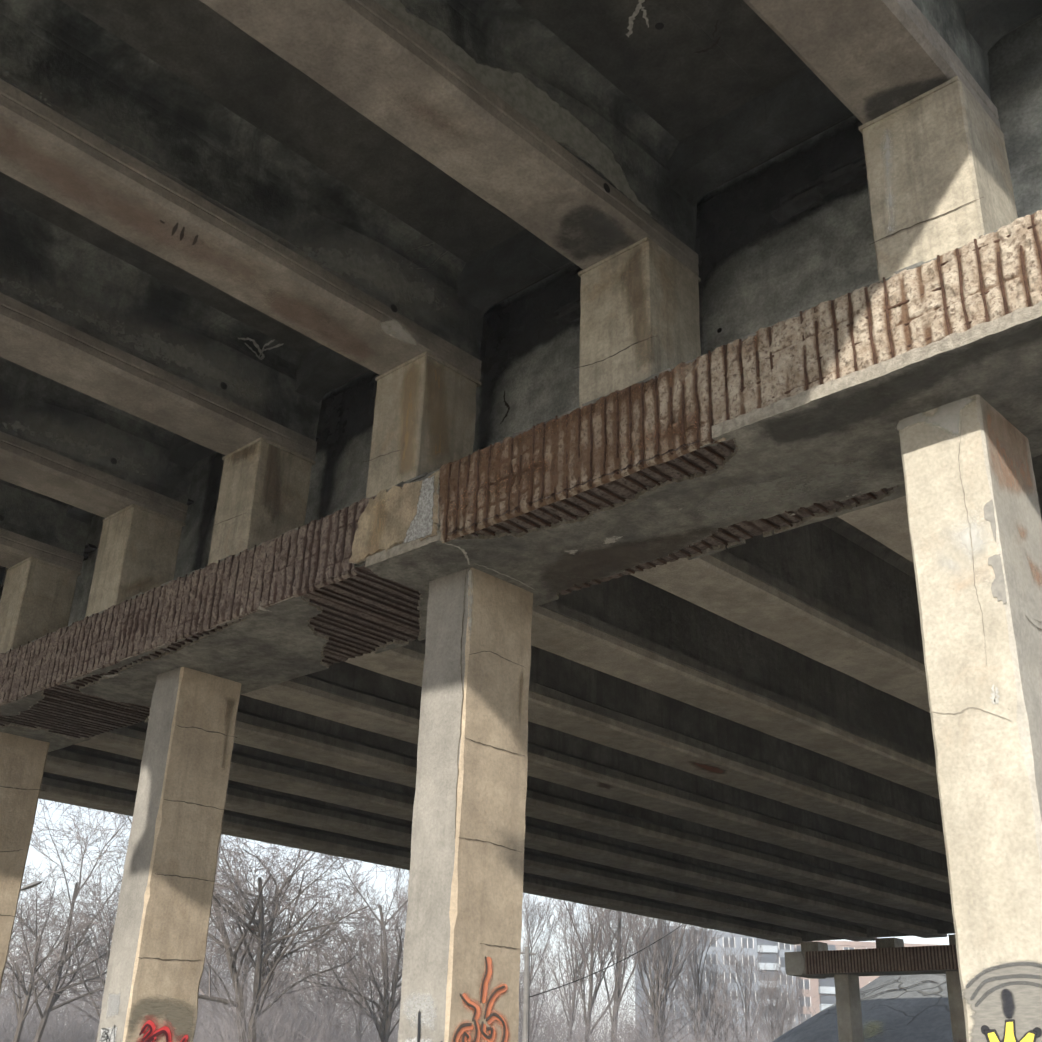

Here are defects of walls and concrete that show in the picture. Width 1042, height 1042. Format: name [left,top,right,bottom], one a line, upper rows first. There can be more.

crack [626,0,649,37]
leakage [559,208,653,361]
crack [574,336,654,369]
spalling [403,210,1042,543]
spalling [0,496,420,738]
spalling [558,487,893,595]
crack [958,411,986,653]
peeling [988,554,1007,604]
crack [445,543,533,852]
crack [929,707,1010,721]